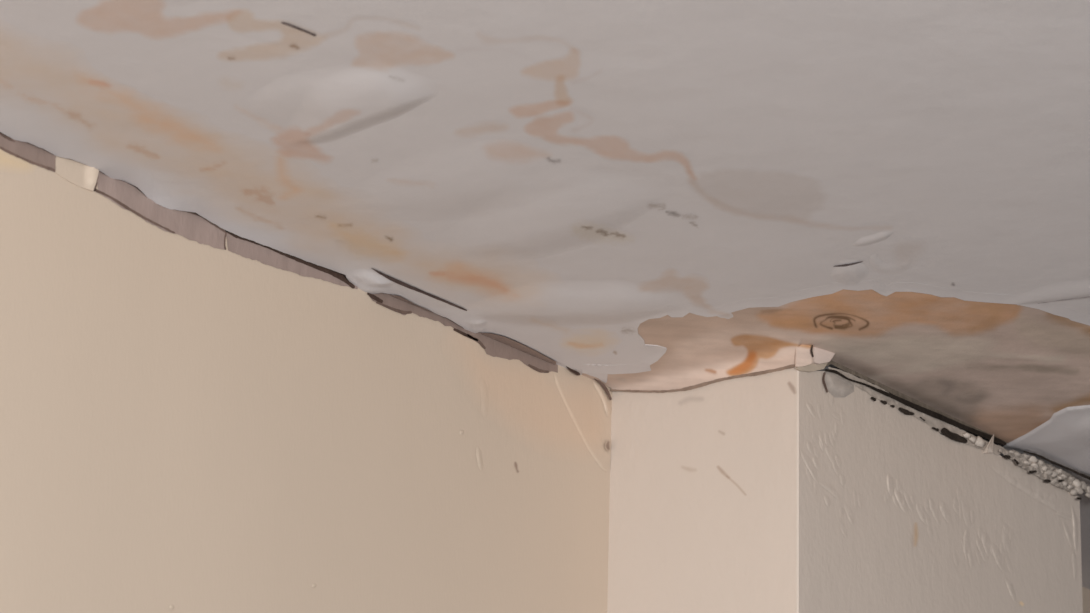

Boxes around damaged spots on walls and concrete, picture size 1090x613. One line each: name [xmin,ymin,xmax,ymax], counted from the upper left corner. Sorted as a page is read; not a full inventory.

leakage [0,0,928,358]
peeling [0,102,1090,580]